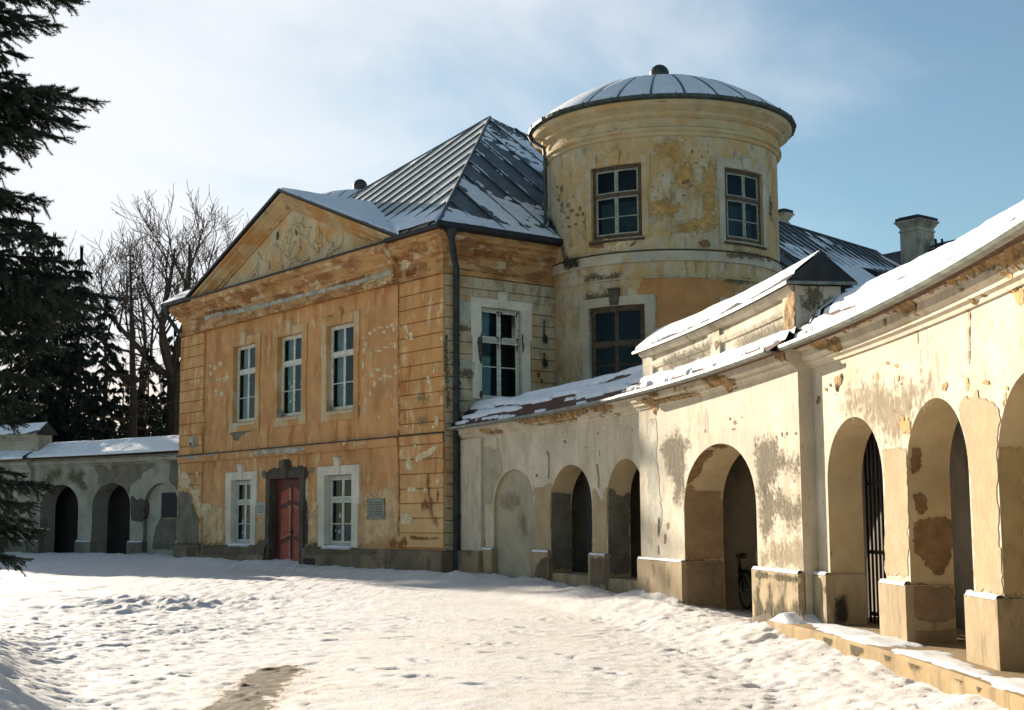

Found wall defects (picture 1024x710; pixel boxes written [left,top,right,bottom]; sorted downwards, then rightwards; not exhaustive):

peeling [650,138,719,238]
peeling [358,323,414,415]
peeling [93,453,223,550]
peeling [405,443,437,470]
leakage [659,428,690,506]
leakage [753,433,801,544]
peeling [882,447,954,577]